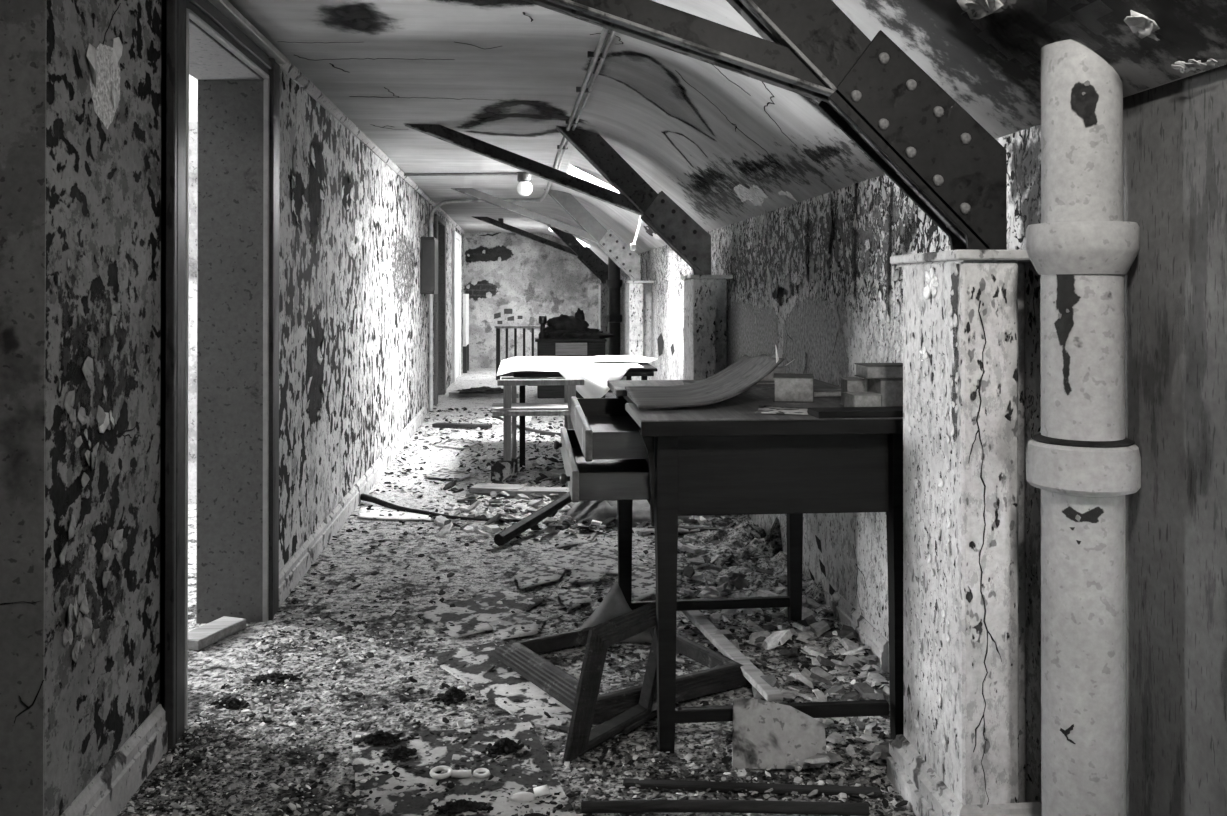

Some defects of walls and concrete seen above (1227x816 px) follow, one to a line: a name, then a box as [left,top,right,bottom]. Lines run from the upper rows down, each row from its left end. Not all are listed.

leakage [321,4,396,35]
peeling [86,37,123,129]
leakage [458,99,585,137]
peeling [1070,80,1099,127]
peeling [290,141,326,256]
peeling [305,316,329,426]
spalling [463,279,498,303]
spalling [465,244,514,263]
leakage [584,51,873,299]
leakage [886,182,920,315]
peeling [1053,274,1081,395]
crack [969,300,1002,805]